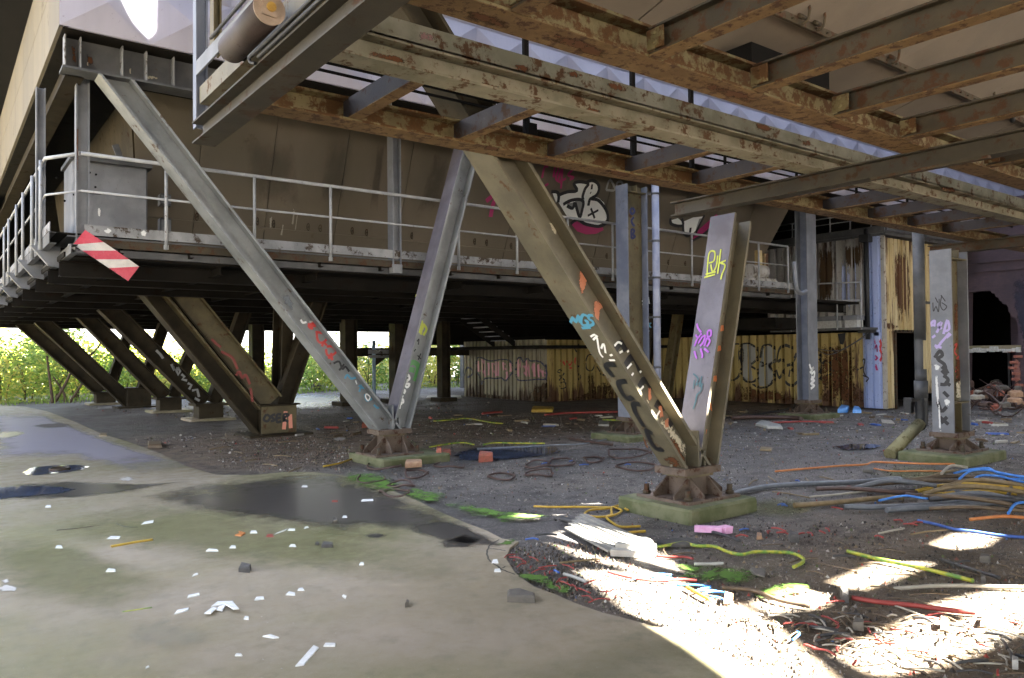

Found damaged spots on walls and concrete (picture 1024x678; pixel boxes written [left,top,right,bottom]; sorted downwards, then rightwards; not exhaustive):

corrosion [467,11,509,28]
corrosion [372,52,405,63]
corrosion [884,252,910,330]
corrosion [818,344,864,404]